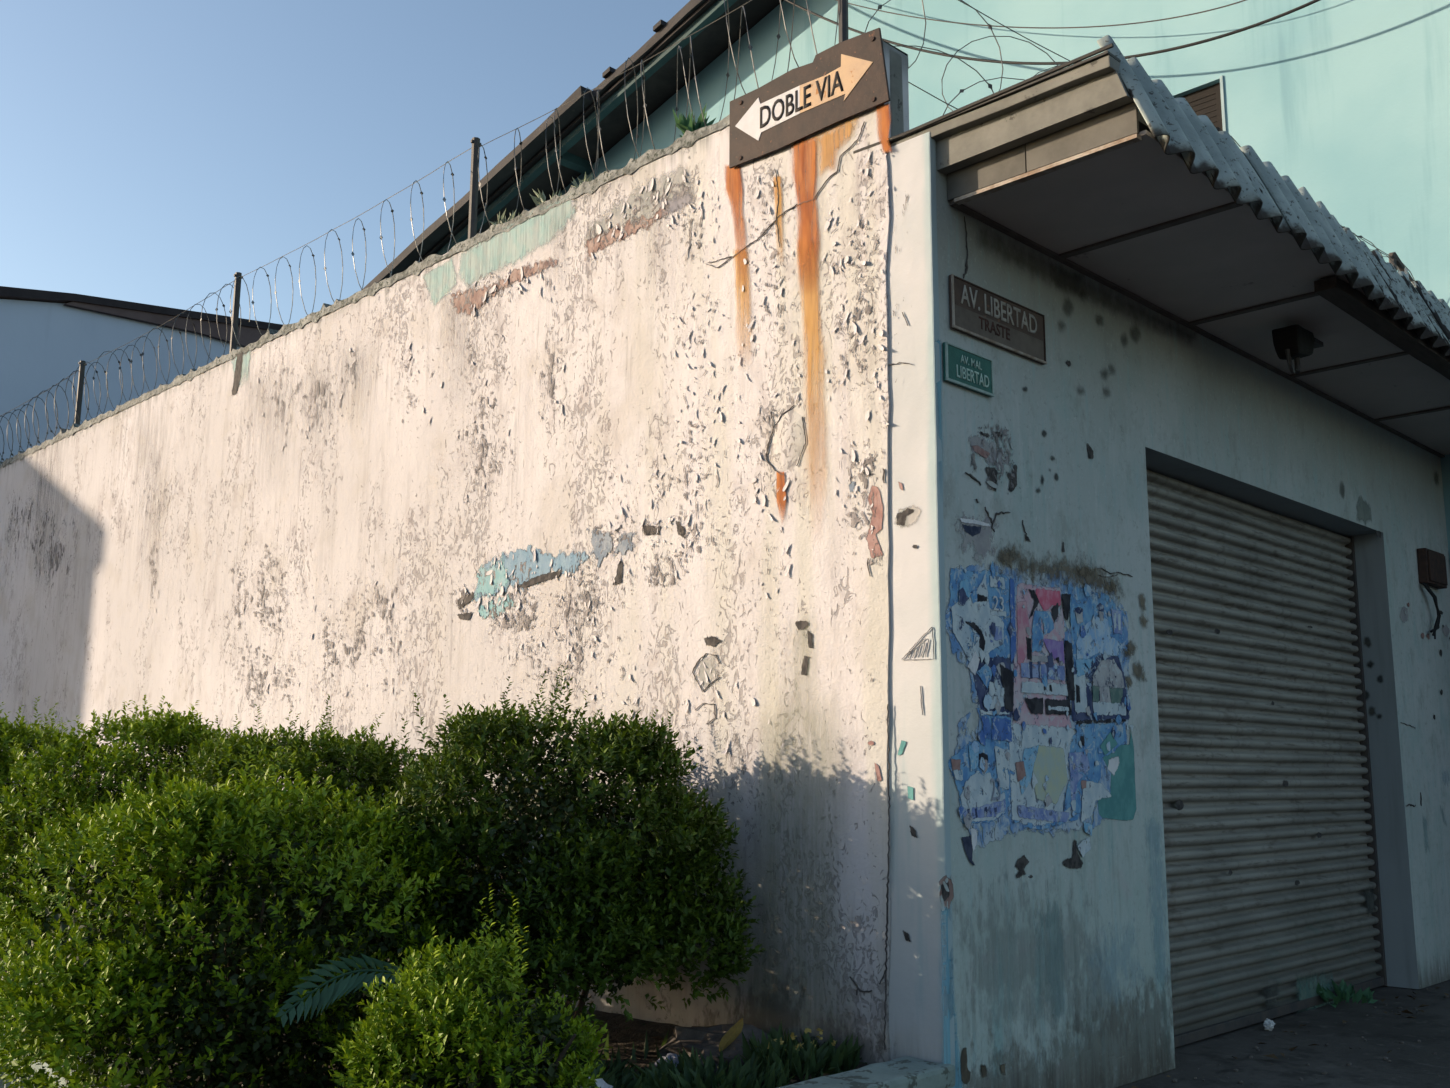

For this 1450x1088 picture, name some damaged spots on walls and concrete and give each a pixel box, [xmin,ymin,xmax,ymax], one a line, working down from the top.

corrosion [876,102,891,152]
corrosion [725,166,749,319]
corrosion [774,122,852,427]
peeling [818,150,909,429]
peeling [384,332,447,438]
peeling [423,200,574,521]
peeling [449,164,812,719]
flaking render [833,441,921,576]
peeling [969,412,1017,494]
peeling [1098,734,1136,821]
flaking render [962,828,977,865]
flaking render [1063,840,1083,869]